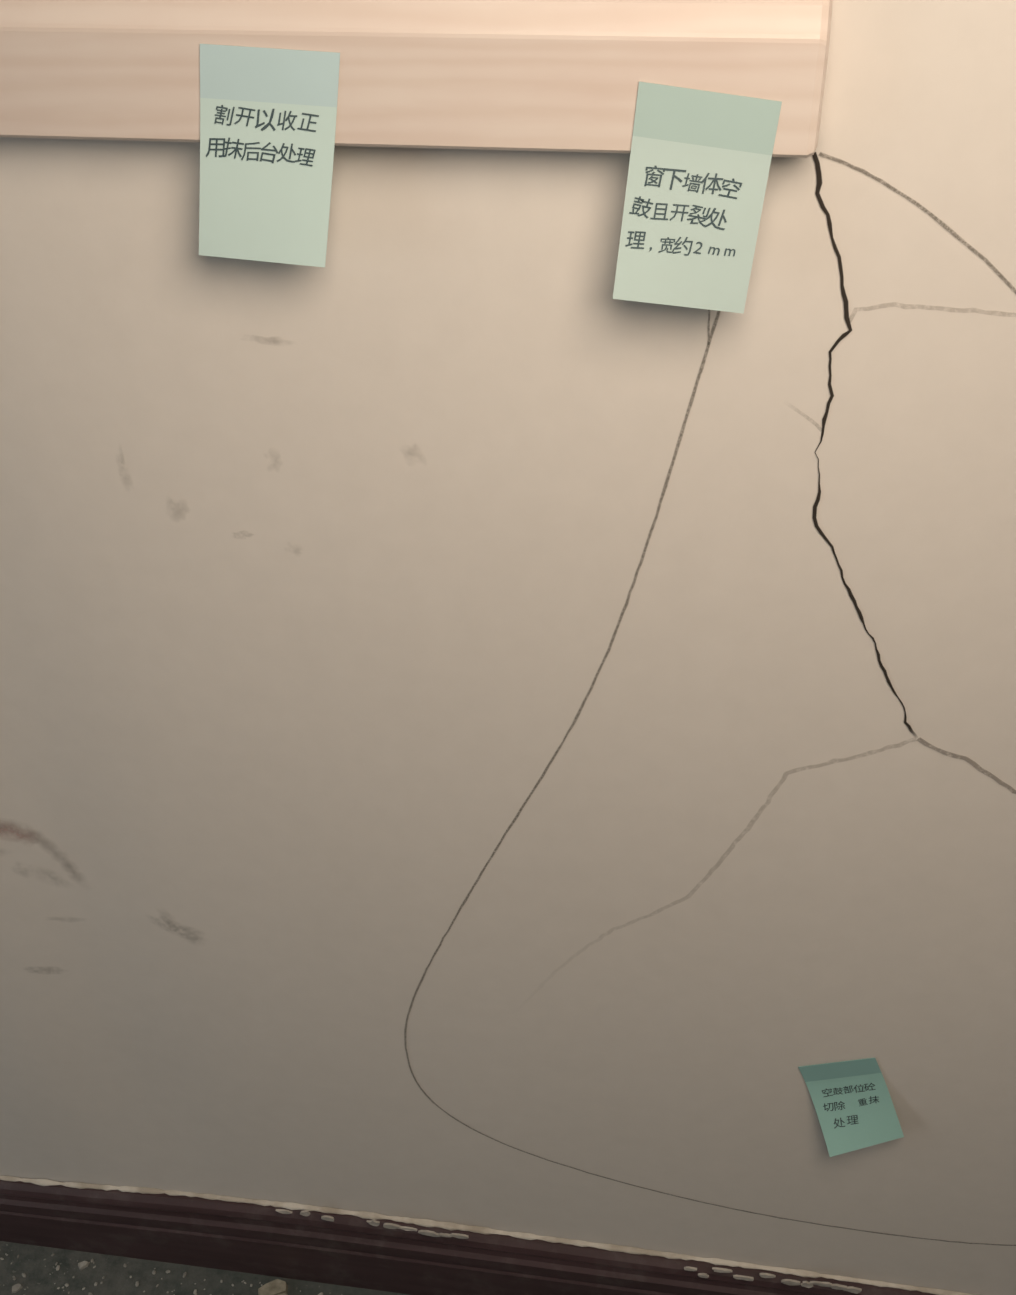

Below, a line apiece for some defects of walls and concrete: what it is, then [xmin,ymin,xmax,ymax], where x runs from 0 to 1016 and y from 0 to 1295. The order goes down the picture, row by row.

crack [812,152,1016,793]